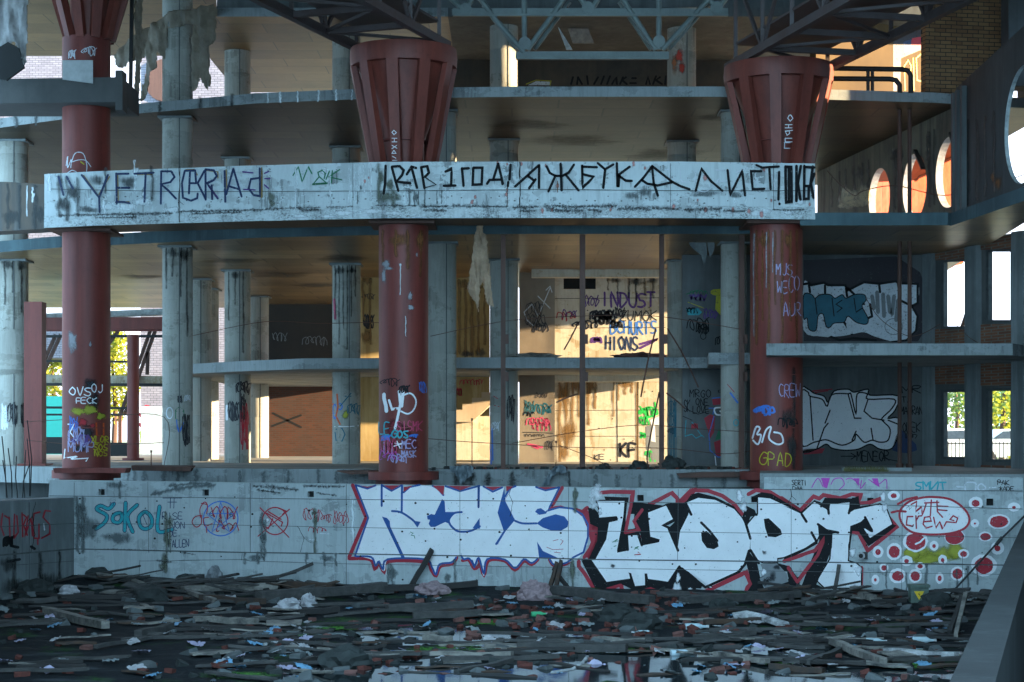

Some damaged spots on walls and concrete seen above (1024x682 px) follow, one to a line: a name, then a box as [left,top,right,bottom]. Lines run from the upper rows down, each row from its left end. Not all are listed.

leakage [5,160,154,229]
leakage [2,261,24,312]
leakage [133,247,188,334]
leakage [221,259,244,353]
leakage [315,256,356,349]